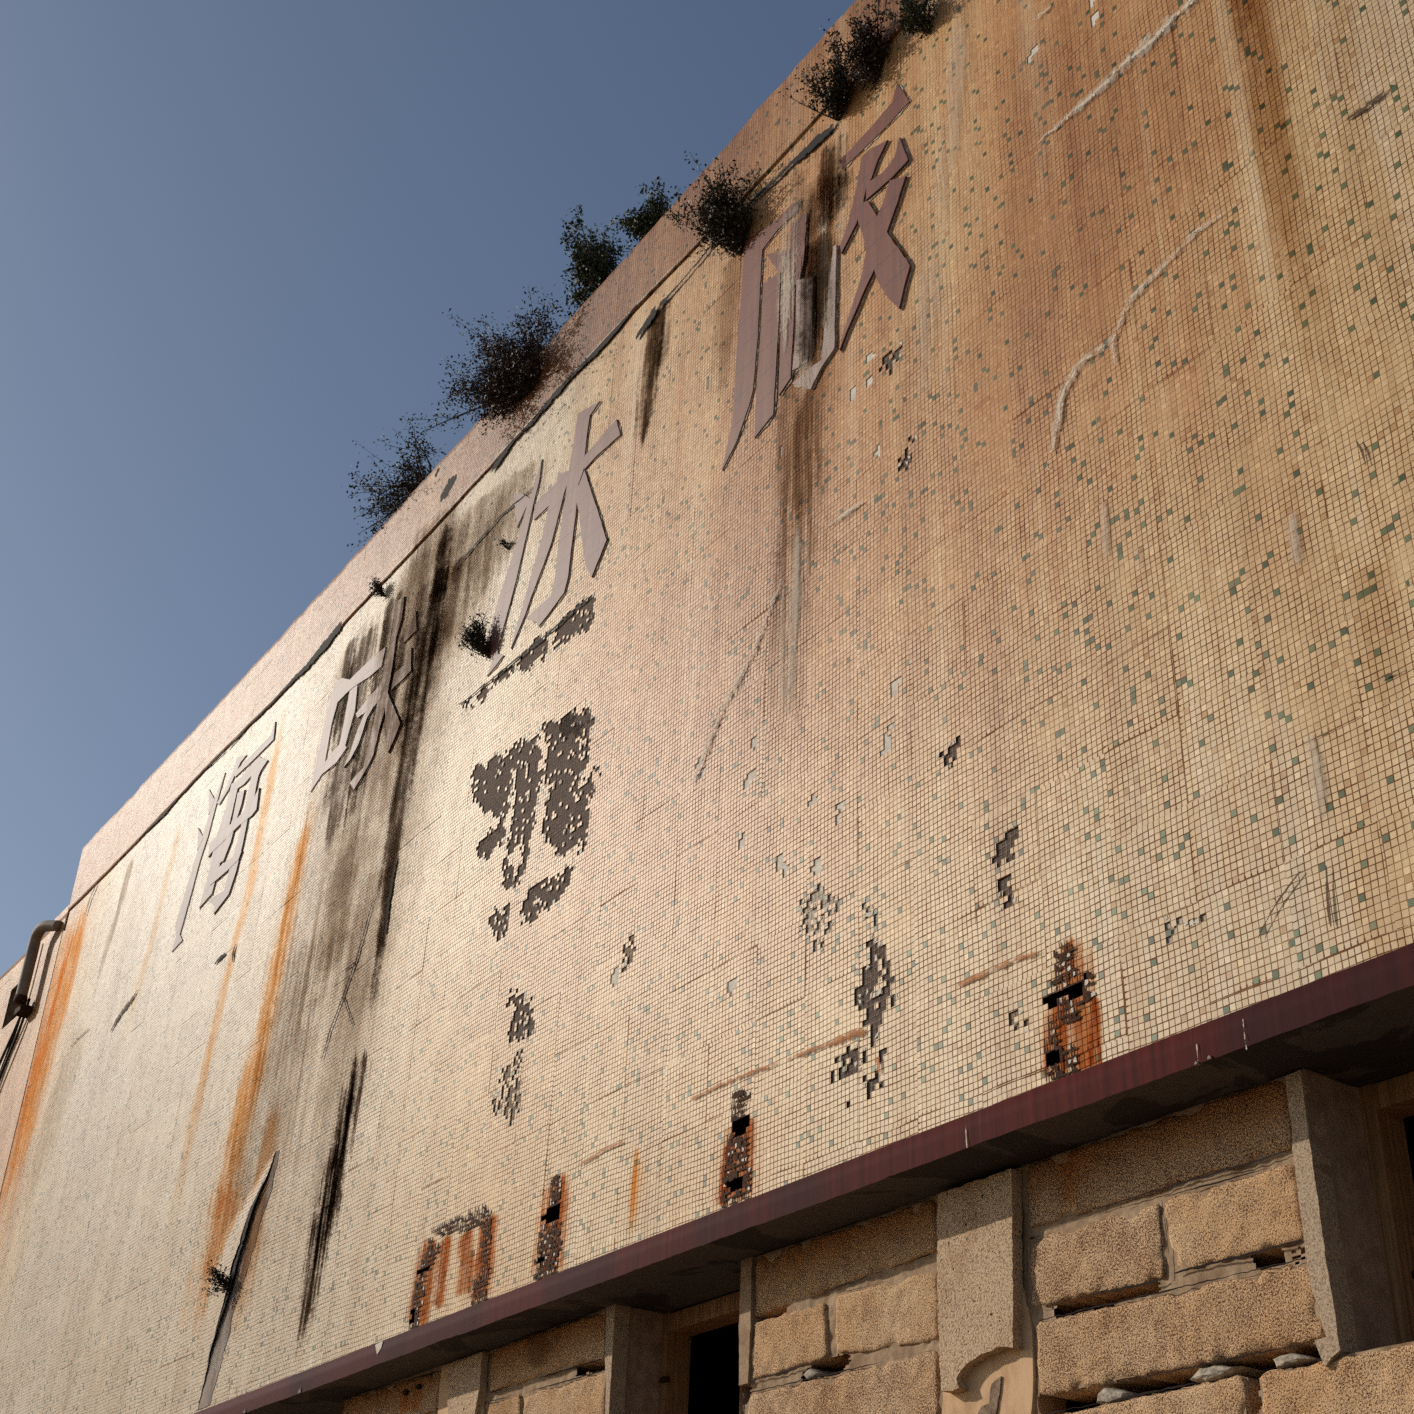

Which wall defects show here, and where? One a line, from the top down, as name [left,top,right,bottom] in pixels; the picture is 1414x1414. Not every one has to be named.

crack [1040,0,1193,140]
water stain [630,302,670,446]
water stain [777,134,847,378]
crack [1046,204,1233,473]
peeling [462,593,596,711]
water stain [780,539,799,705]
water stain [324,523,453,1000]
peeling [492,988,536,1127]
peeling [470,707,602,942]
peeling [798,856,839,953]
peeling [831,897,898,1100]
water stain [297,1050,372,1347]